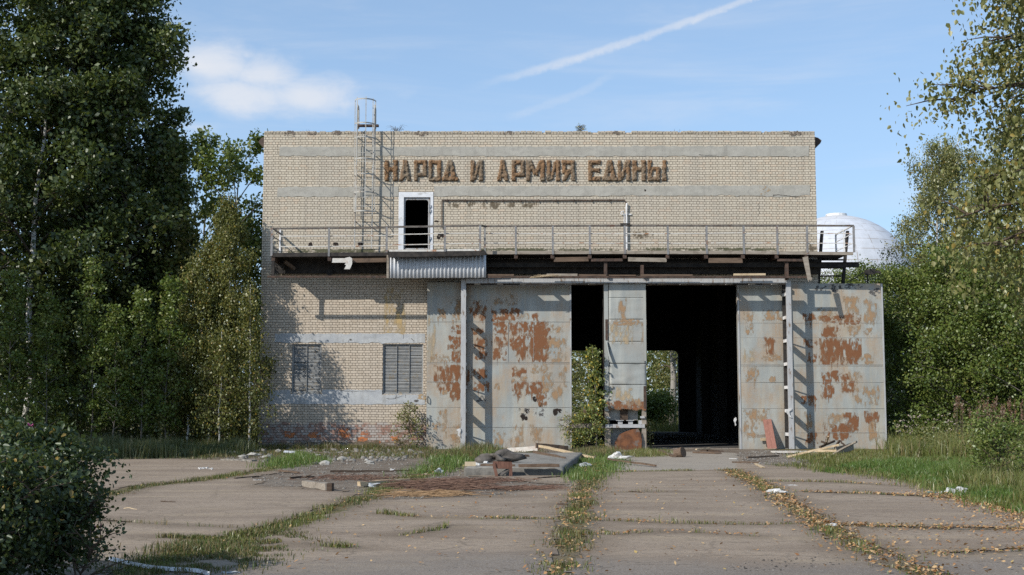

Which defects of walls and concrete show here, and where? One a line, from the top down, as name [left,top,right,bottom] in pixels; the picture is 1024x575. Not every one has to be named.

corrosion [608,300,643,344]
corrosion [427,295,567,443]
corrosion [744,338,782,388]
corrosion [801,296,880,444]
corrosion [593,386,646,423]
corrosion [744,409,767,439]